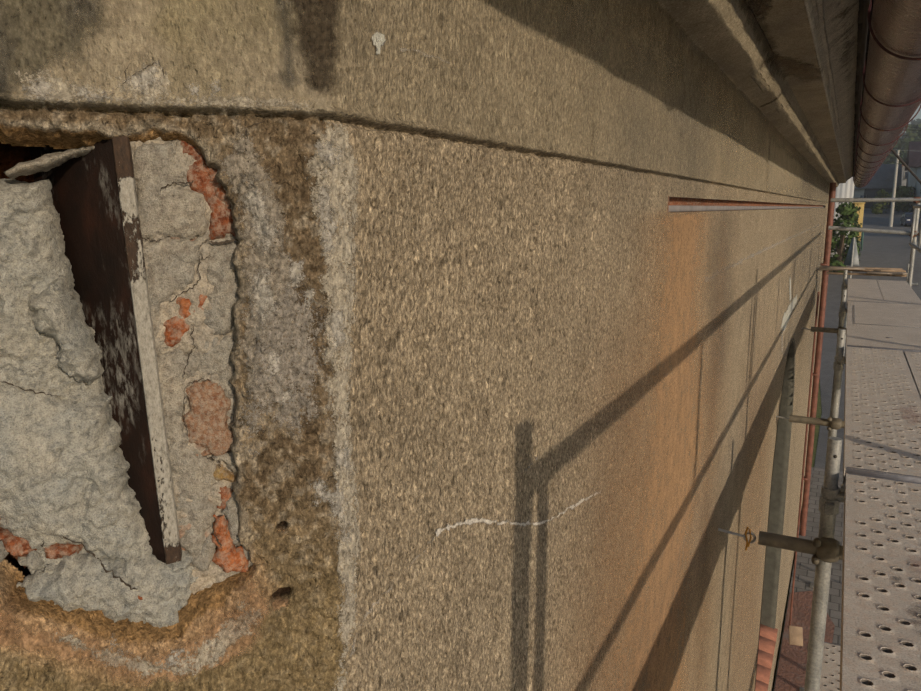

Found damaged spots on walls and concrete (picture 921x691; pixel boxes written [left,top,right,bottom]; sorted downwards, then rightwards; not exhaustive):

leakage [0,0,340,118]
flaking render [0,141,95,183]
flaking render [130,137,253,594]
flaking render [0,518,83,569]